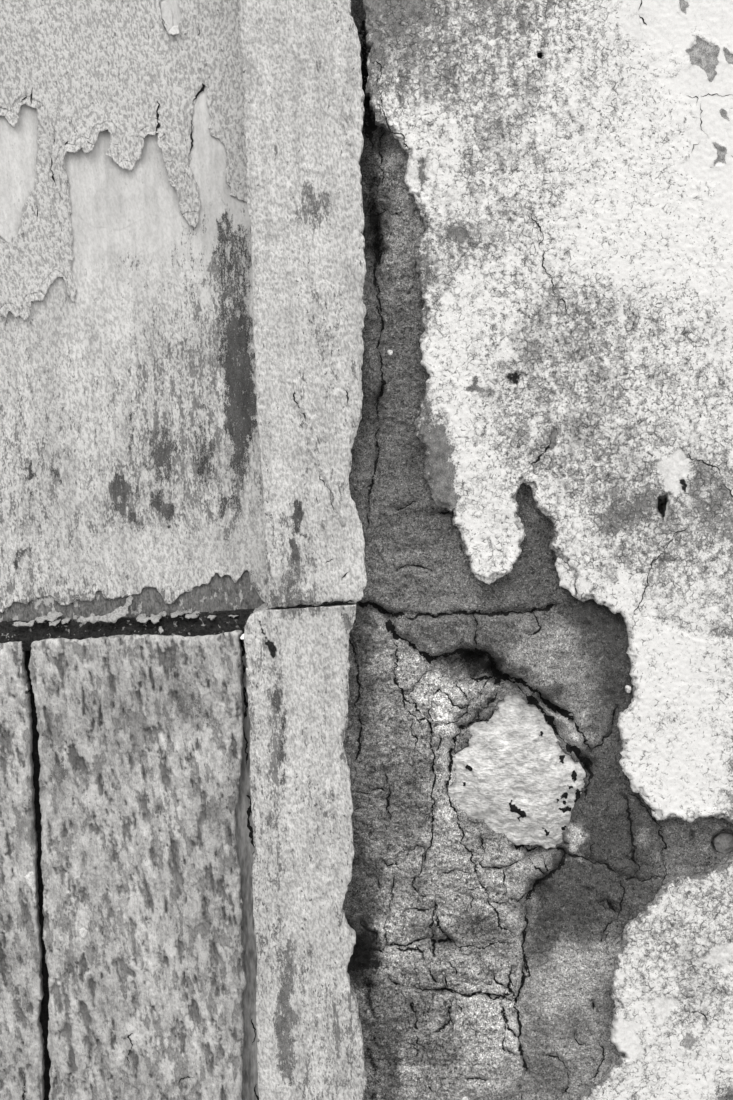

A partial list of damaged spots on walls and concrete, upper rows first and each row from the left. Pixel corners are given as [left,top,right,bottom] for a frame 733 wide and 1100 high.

peeling [159,0,189,36]
peeling [0,96,46,243]
peeling [57,87,227,230]
peeling [0,270,69,343]
damp [193,210,258,517]
damp [106,421,181,529]
flaking render [291,0,733,1100]
crack [299,559,667,1099]